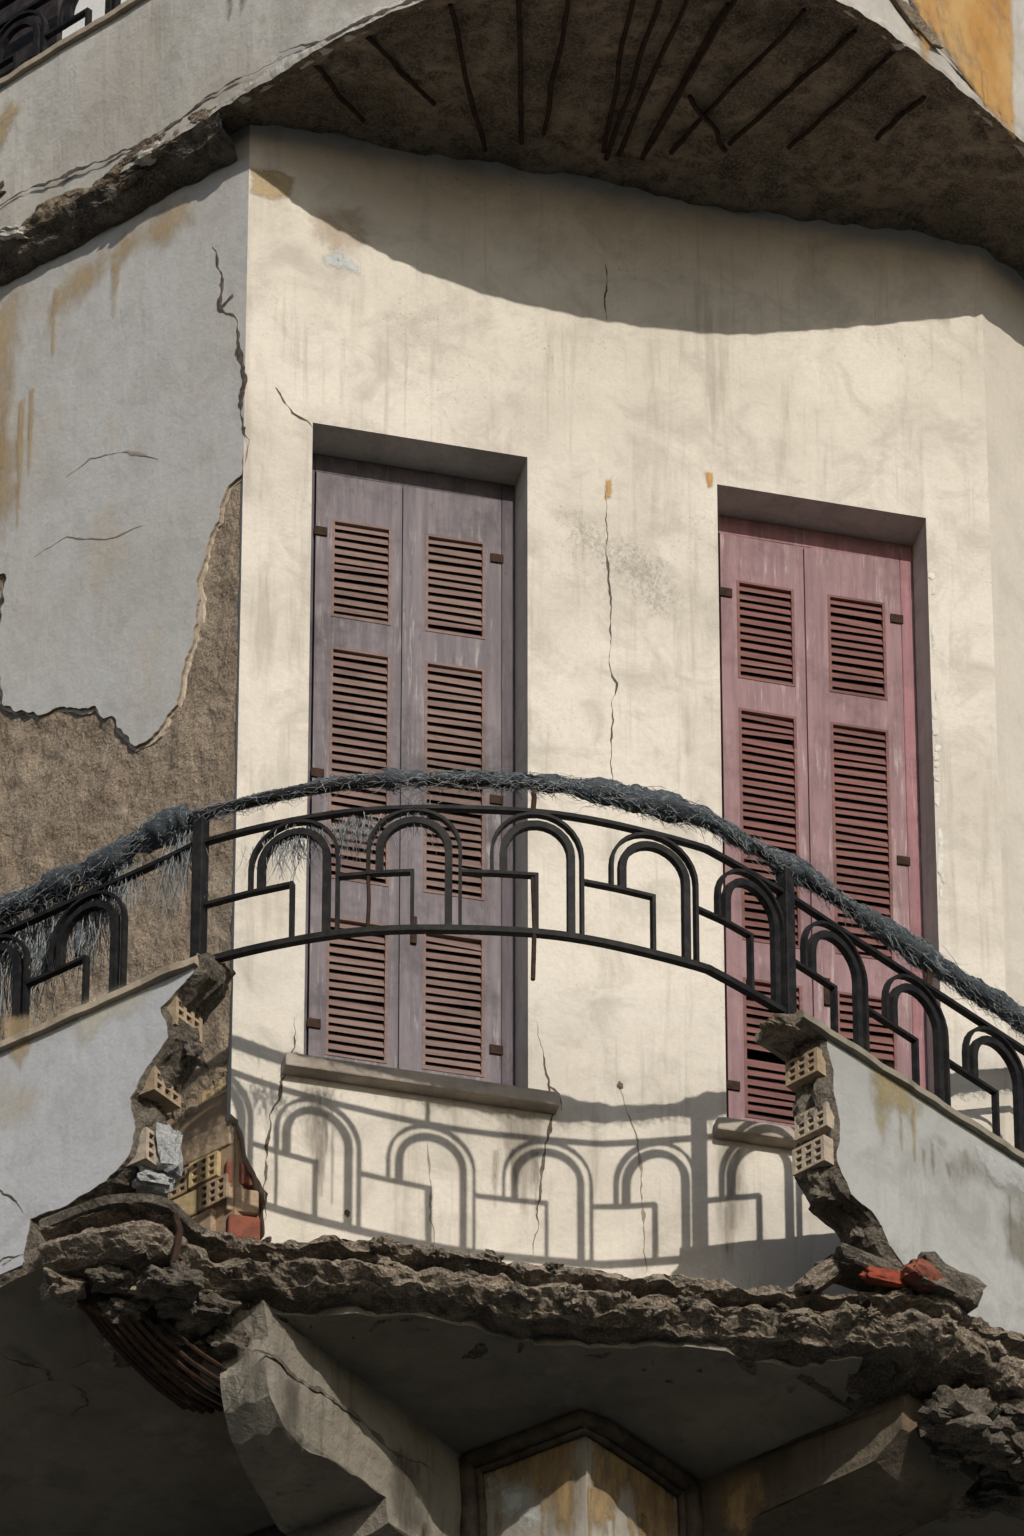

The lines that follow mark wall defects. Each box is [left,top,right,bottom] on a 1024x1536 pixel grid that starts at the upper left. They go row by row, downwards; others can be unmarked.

spalling [0,0,1024,287]
leakage [0,302,33,510]
crack [38,526,140,555]
crack [66,450,158,477]
leakage [53,204,184,312]
crack [212,246,313,461]
crack [602,264,610,319]
crack [605,476,618,807]
spalling [0,482,1024,1523]
crack [263,1017,296,1222]
crack [531,1025,562,1256]
crack [620,1089,647,1273]